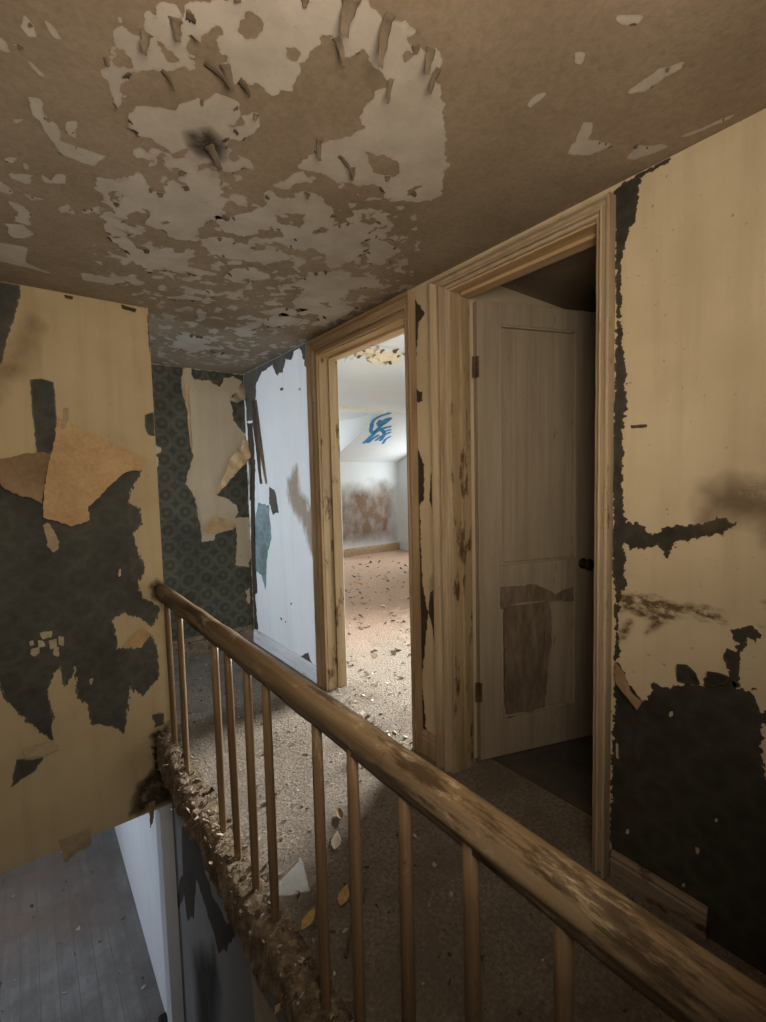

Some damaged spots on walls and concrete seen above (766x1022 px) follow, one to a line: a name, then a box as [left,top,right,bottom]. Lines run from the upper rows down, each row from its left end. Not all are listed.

peeling [0,16,61,52]
damp [190,132,223,158]
peeling [13,0,450,337]
peeling [0,157,66,273]
peeling [172,332,231,358]
peeling [345,346,405,365]
damp [342,485,391,541]
peeling [177,826,234,954]